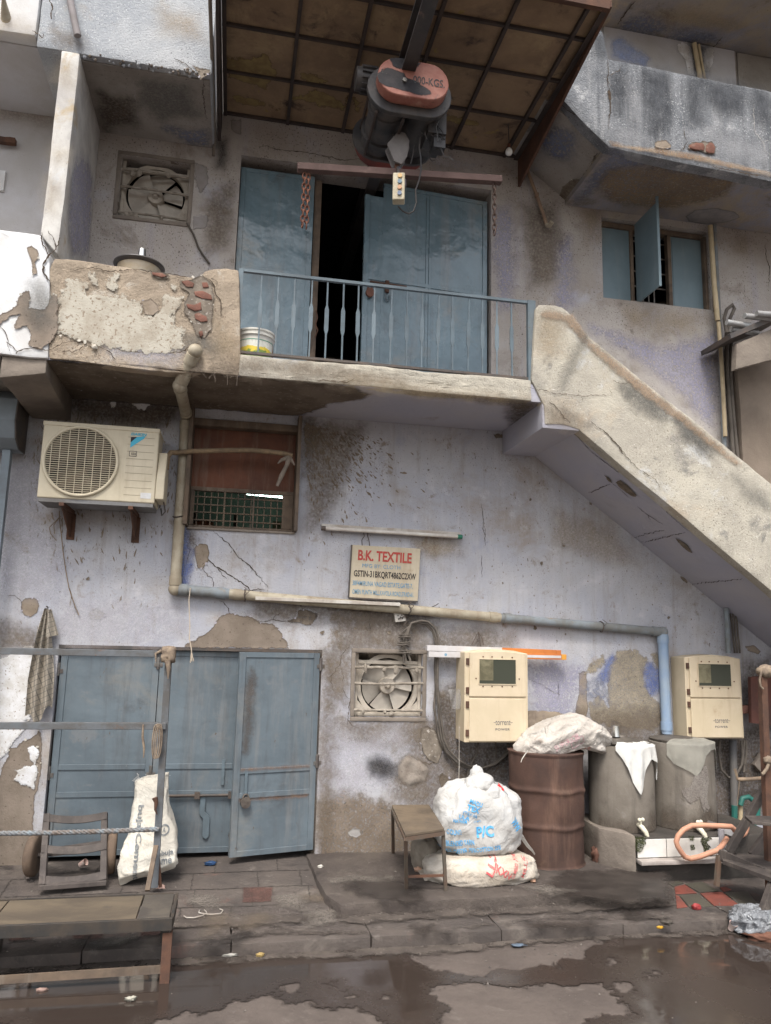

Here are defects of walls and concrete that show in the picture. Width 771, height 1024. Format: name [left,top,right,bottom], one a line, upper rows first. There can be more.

damp [623,15,743,119]
peeling [0,271,215,354]
damp [47,361,427,557]
crack [524,380,683,543]
peeling [21,597,39,617]
crack [186,533,268,611]
peeling [185,609,324,649]
peeling [575,671,588,717]
peeling [0,646,42,866]